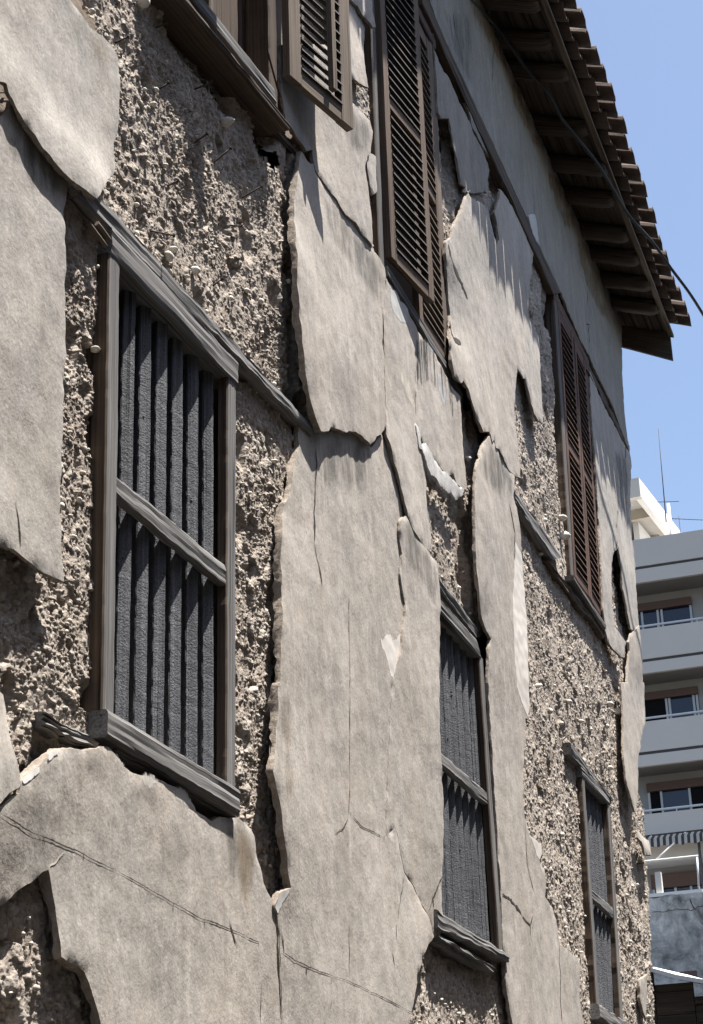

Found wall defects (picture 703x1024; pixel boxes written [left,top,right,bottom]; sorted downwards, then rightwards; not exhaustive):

peeling [0,0,377,1024]
crack [2,814,410,1022]
crack [314,456,322,581]
spalling [381,33,655,1024]